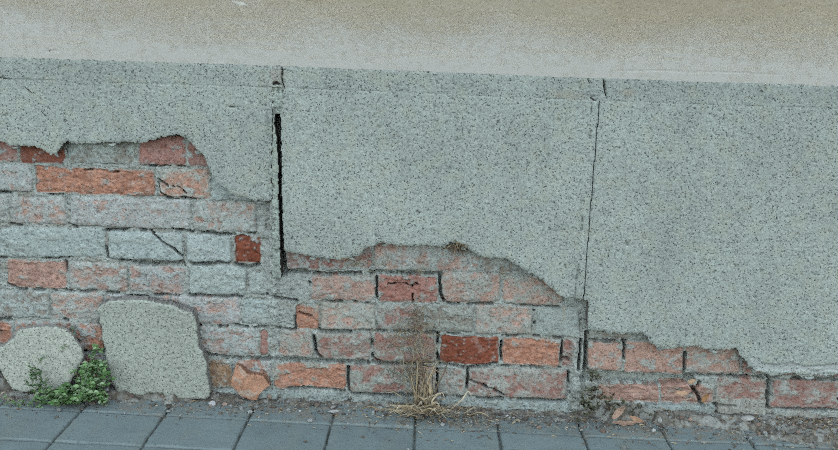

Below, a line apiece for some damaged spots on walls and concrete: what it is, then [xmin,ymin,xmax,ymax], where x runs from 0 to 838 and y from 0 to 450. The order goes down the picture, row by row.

spalling [36,165,154,196]
spalling [235,235,262,263]
spalling [9,262,67,288]
spalling [380,278,437,303]
spalling [0,323,11,344]
spalling [79,335,104,350]
spalling [297,311,319,330]
spalling [441,334,560,365]
spalling [605,378,714,406]